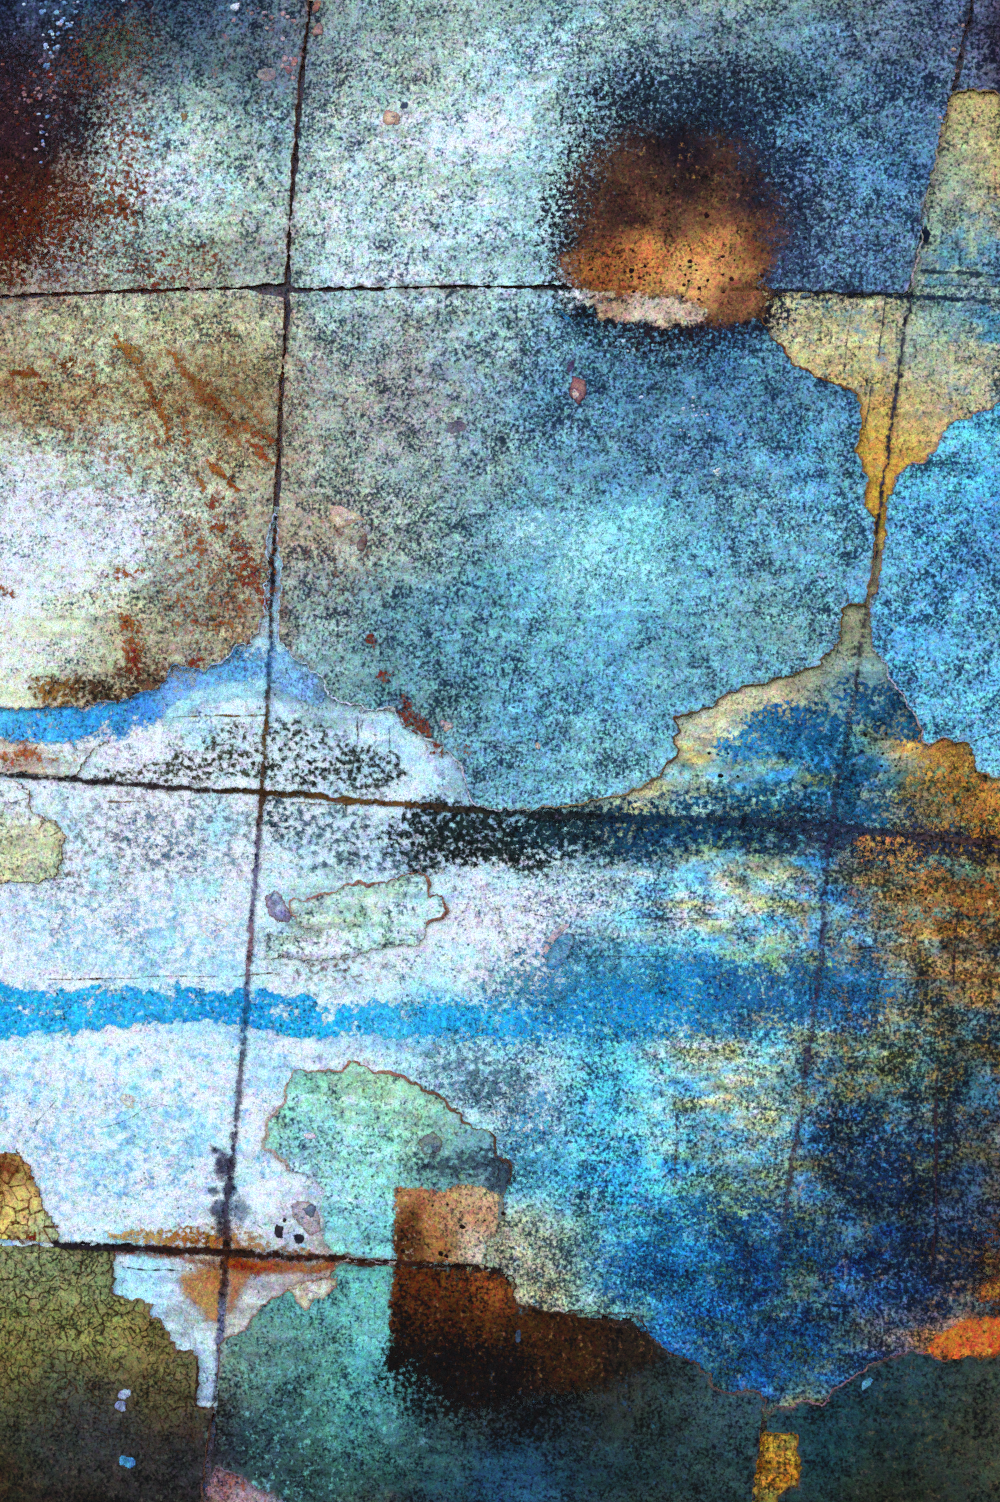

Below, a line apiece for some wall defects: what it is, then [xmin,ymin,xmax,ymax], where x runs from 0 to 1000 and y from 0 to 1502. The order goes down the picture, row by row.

peeling [230,3,305,81]
rust [0,14,235,305]
rust [529,44,900,369]
crack [920,269,1000,287]
rust [4,324,302,707]
spalling [329,506,368,551]
crack [172,712,264,720]
crack [47,972,277,980]
crack [0,1102,199,1470]
rust [372,1183,668,1453]
peeling [205,1466,284,1502]
peeling [752,1426,802,1502]